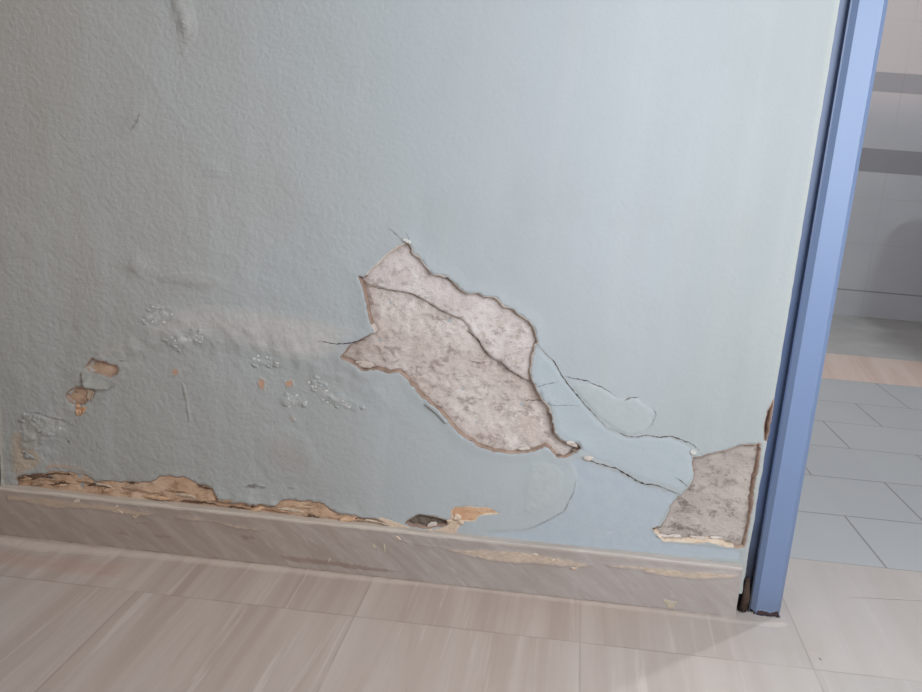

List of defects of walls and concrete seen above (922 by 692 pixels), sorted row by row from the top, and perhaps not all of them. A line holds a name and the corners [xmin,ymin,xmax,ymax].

peeling [65,358,119,416]
damp [36,304,357,439]
spalling [340,238,774,560]
crack [538,348,697,455]
peeling [17,471,500,540]
crack [583,456,688,493]